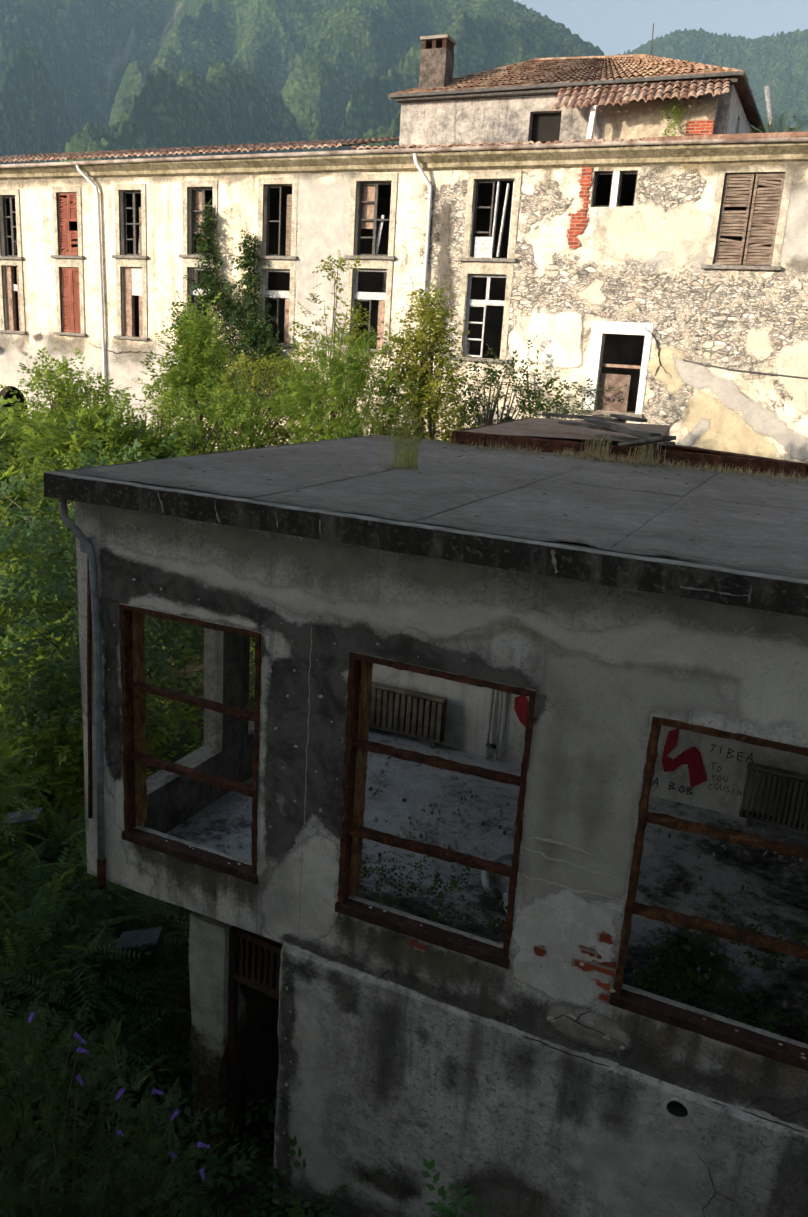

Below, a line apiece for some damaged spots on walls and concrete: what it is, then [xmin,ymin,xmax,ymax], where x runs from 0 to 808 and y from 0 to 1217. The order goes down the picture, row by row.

water stain [430,191,453,323]
flaking render [566,166,716,268]
water stain [78,502,808,641]
water stain [99,547,548,862]
flaking render [511,888,619,1008]
crack [520,1034,612,1067]
crack [709,1096,807,1134]
water stain [285,1164,419,1217]